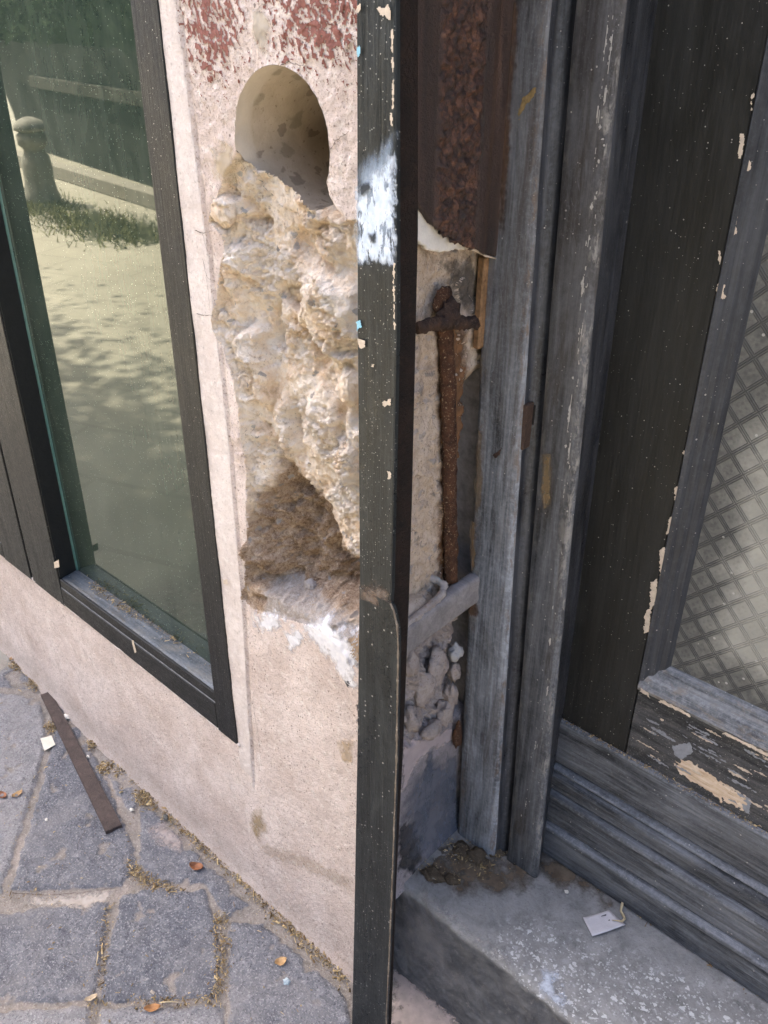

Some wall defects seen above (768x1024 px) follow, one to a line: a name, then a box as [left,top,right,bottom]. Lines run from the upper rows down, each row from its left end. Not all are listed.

peeling [177,0,361,101]
spalling [208,153,365,643]
rust [452,329,467,458]
efflorescence [254,611,359,688]
peeling [643,547,665,633]
spalling [386,603,464,1024]
peeling [632,688,768,814]